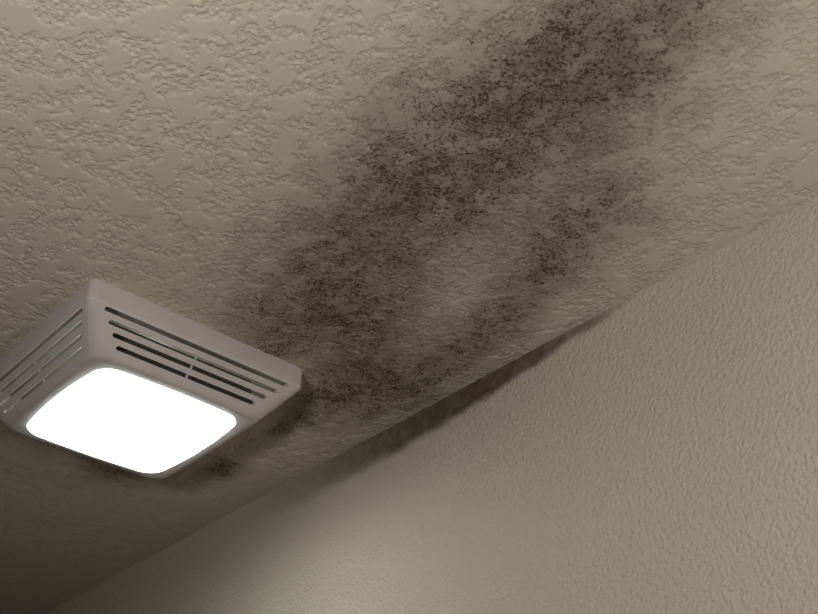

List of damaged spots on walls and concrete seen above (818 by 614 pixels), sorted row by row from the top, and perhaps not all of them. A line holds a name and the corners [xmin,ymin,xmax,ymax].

water stain [234,0,704,457]